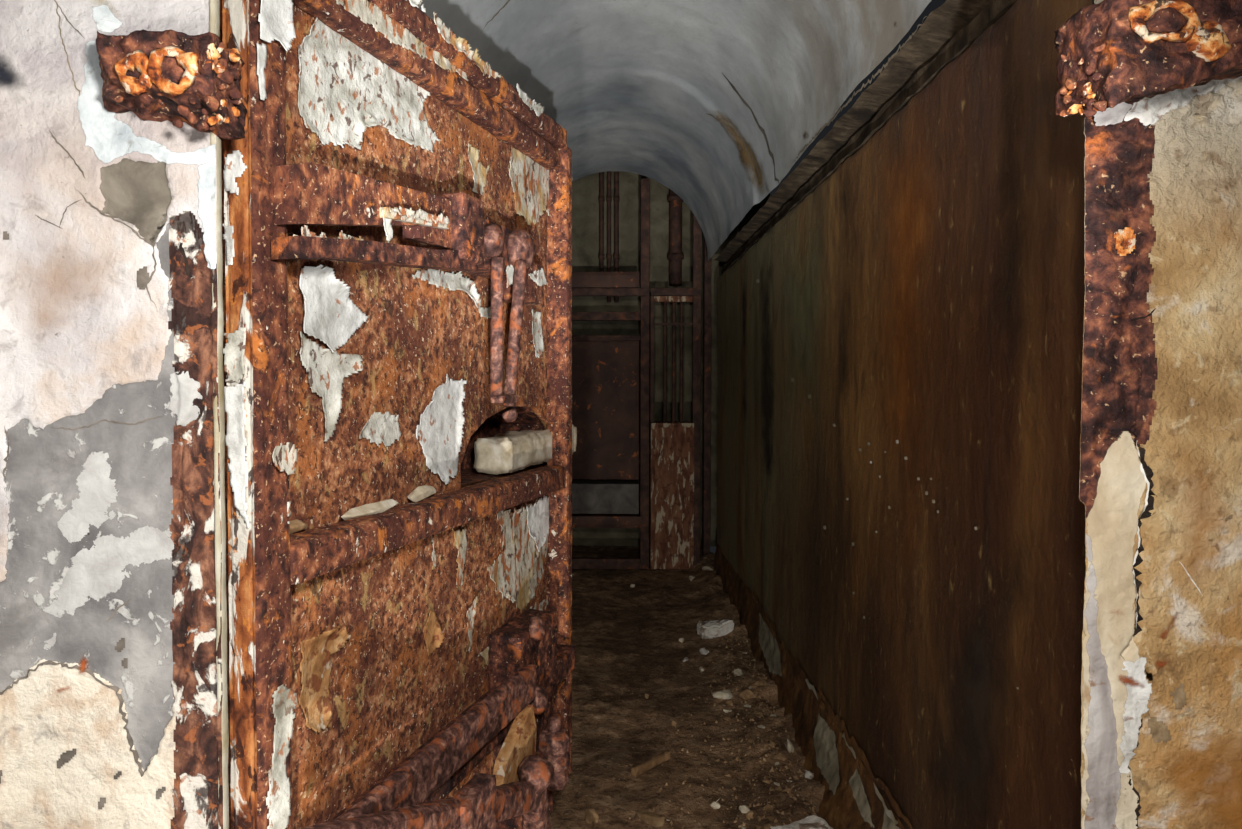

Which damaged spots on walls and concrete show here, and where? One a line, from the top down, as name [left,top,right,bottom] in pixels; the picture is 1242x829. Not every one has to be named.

peeling [256,0,440,153]
peeling [336,0,503,81]
crack [722,11,933,182]
peeling [380,206,449,243]
peeling [509,145,549,225]
peeling [412,268,491,319]
peeling [299,265,369,442]
flaking render [0,5,249,829]
peeling [272,442,298,475]
peeling [359,374,467,485]
flaking render [1079,76,1242,829]
peeling [487,494,549,613]